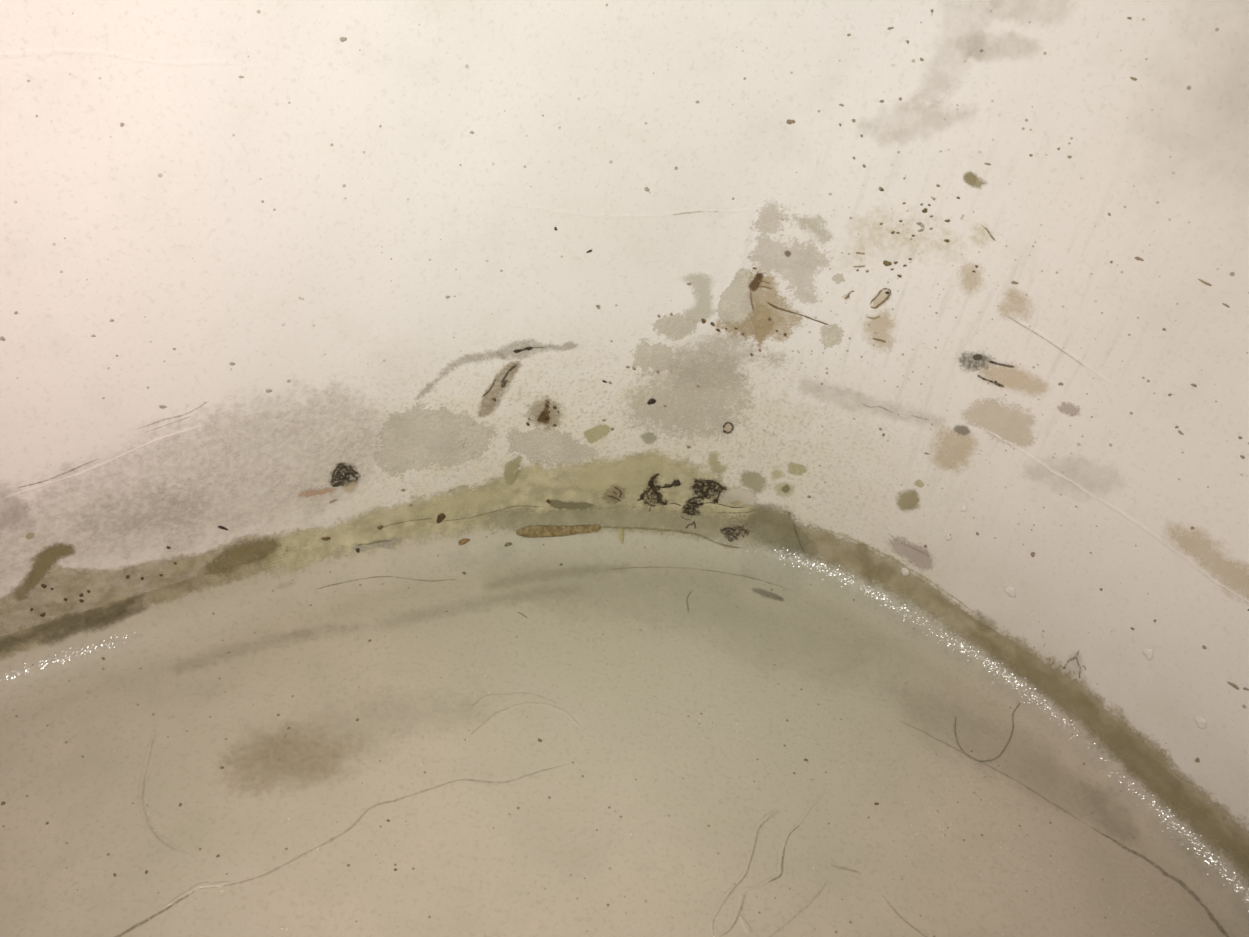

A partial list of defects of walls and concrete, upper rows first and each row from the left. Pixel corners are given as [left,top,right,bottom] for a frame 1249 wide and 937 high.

damp [750,205,854,303]
damp [820,324,843,348]
damp [375,342,598,477]
damp [630,313,783,438]
damp [954,354,1033,446]
damp [1060,403,1079,415]
damp [305,463,358,496]
damp [491,473,790,551]
damp [898,480,923,510]